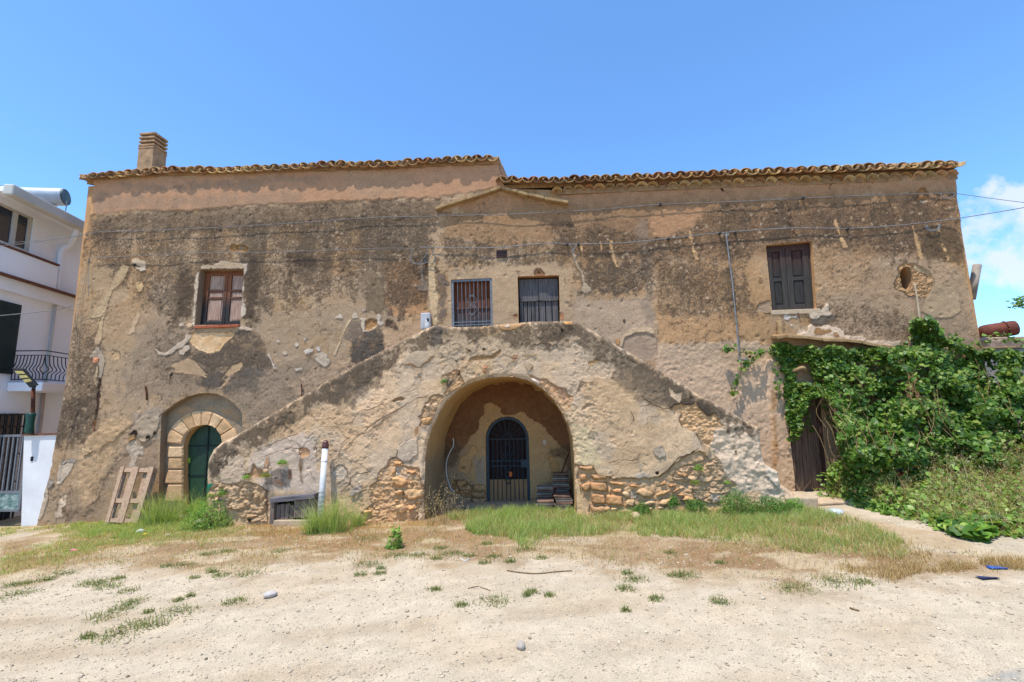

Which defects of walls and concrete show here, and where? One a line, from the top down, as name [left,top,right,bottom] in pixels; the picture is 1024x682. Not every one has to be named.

damp [912,223,963,262]
flaking render [895,264,935,297]
peeling [147,244,253,378]
peeling [268,309,384,369]
peeling [756,301,901,346]
peeling [374,397,404,427]
flaking render [207,454,271,522]
flaking render [350,458,424,522]
flaking render [575,387,736,515]
peeling [765,466,780,487]